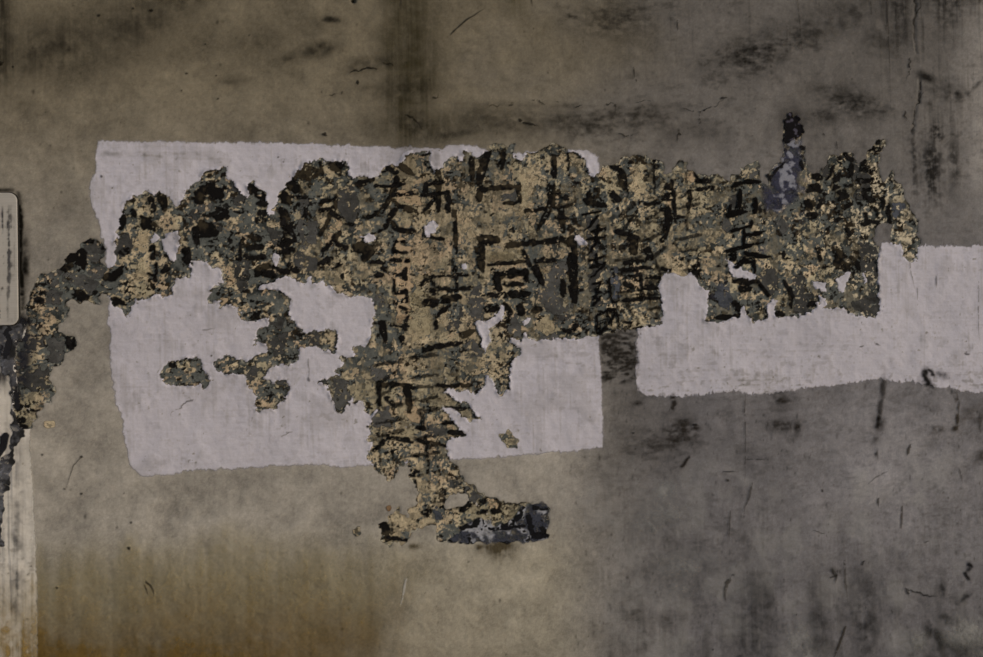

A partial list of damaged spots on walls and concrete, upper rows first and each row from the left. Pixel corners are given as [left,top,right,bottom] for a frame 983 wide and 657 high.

water stain [386,0,428,138]
crack [904,58,921,127]
peeling [13,112,921,547]